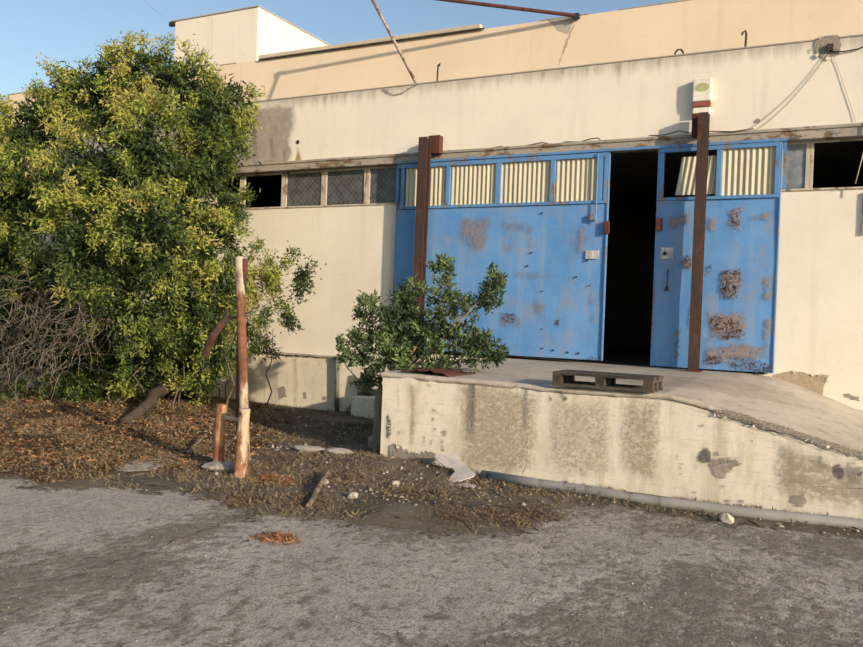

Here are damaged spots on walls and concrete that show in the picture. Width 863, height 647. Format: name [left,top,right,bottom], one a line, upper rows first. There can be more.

leakage [237,108,293,164]
rust [718,269,741,299]
rust [710,316,744,340]
rust [706,356,772,375]
flaking render [773,370,829,395]
leakage [550,392,605,471]
leakage [624,406,657,476]
leakage [779,451,863,503]